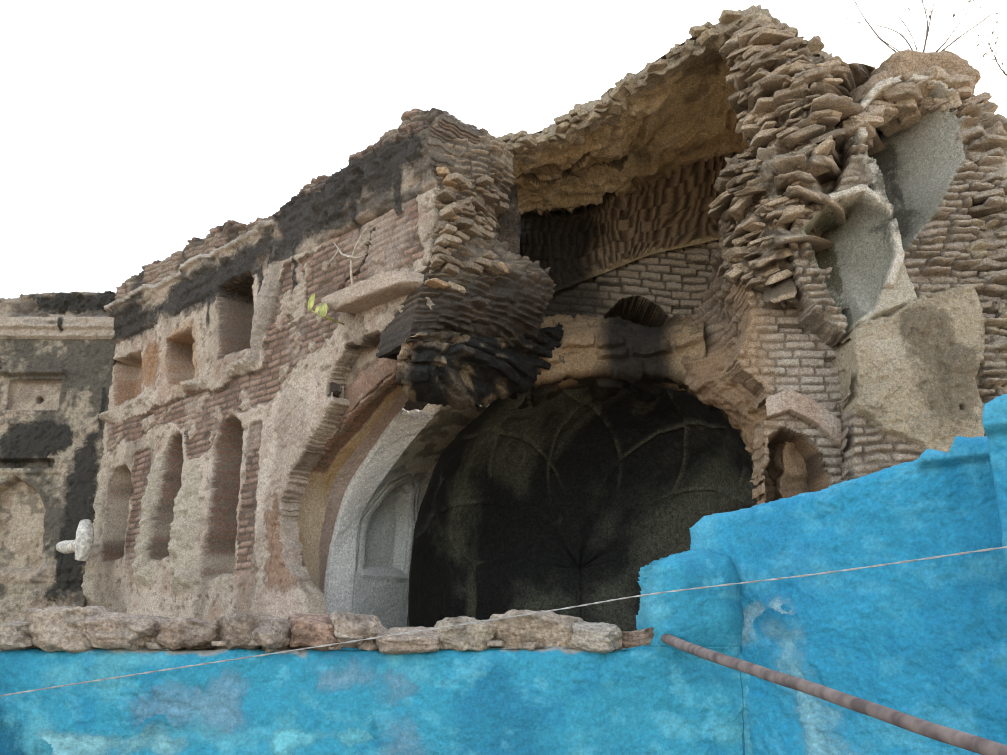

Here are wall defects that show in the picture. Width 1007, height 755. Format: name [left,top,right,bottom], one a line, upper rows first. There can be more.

flaking render [904,141,1007,404]
spalling [681,219,767,487]
spalling [766,441,810,501]
flaking render [853,406,924,478]
peeling [742,600,803,678]
peeling [271,729,324,755]
crack [738,672,746,755]
peeling [797,691,851,755]